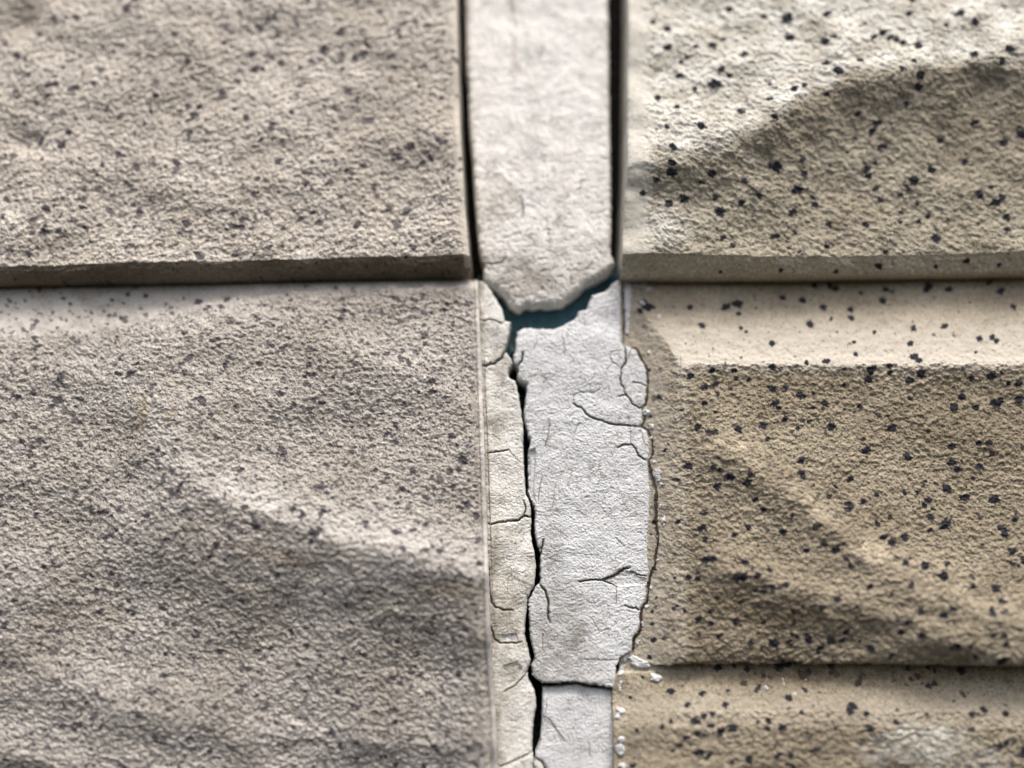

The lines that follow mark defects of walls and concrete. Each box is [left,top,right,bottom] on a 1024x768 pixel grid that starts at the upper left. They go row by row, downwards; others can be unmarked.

crack [483,283,660,768]